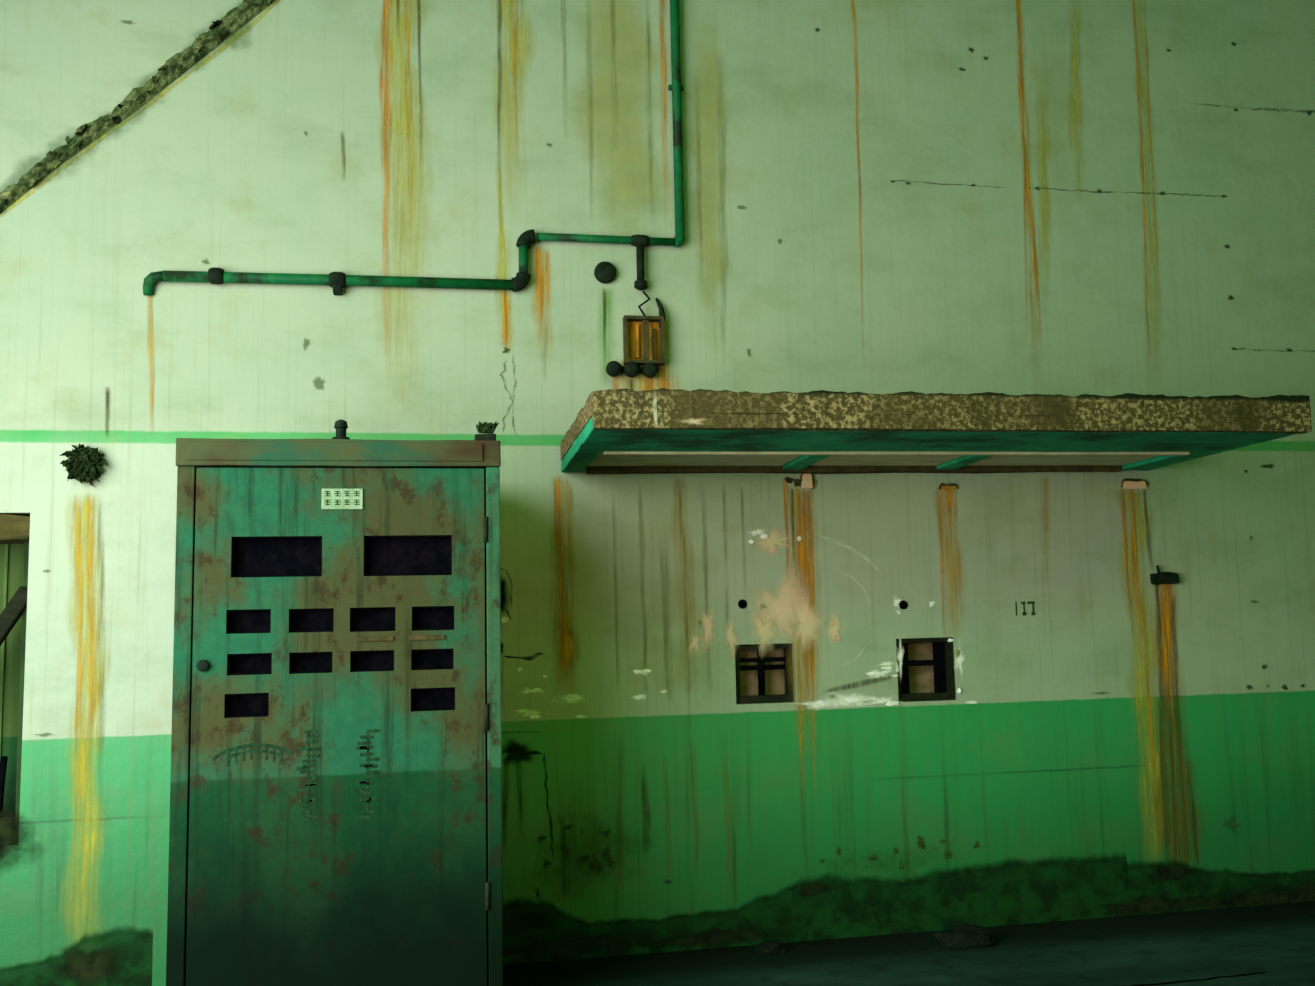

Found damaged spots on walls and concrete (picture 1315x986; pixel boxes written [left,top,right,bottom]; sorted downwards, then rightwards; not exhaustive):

corrosion [381,0,420,234]
corrosion [499,189,507,340]
corrosion [499,0,527,115]
corrosion [1019,50,1037,288]
corrosion [1140,127,1157,253]
corrosion [557,482,573,674]
corrosion [784,481,813,612]
corrosion [74,500,99,886]
corrosion [798,636,814,744]
corrosion [1122,491,1197,859]
leakage [503,840,1315,965]